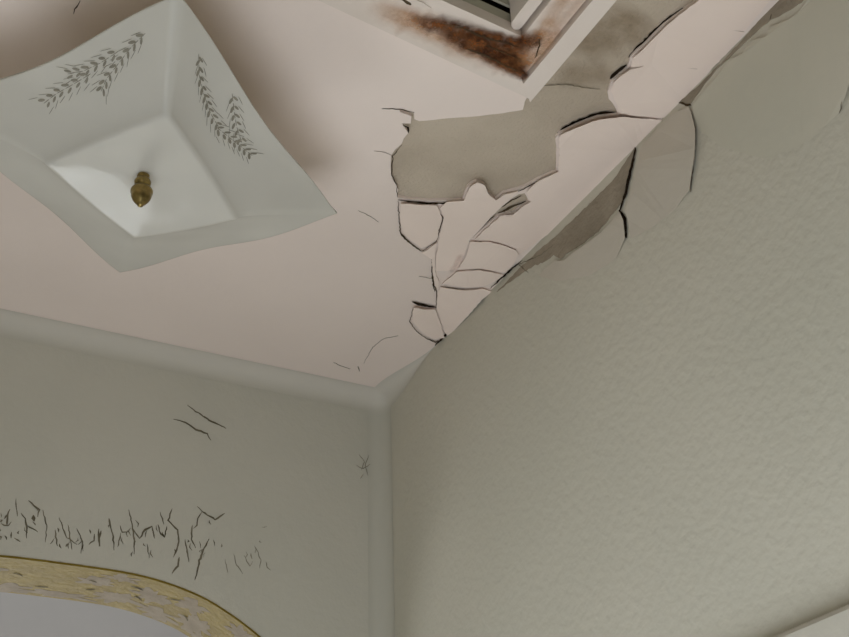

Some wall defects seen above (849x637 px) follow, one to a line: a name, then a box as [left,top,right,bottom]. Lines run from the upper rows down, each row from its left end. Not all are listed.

rust [405,13,550,79]
peeling [391,0,849,339]
crack [333,108,465,372]
crack [470,182,536,242]
crack [491,245,553,288]
crack [174,405,225,440]
crack [0,501,270,579]